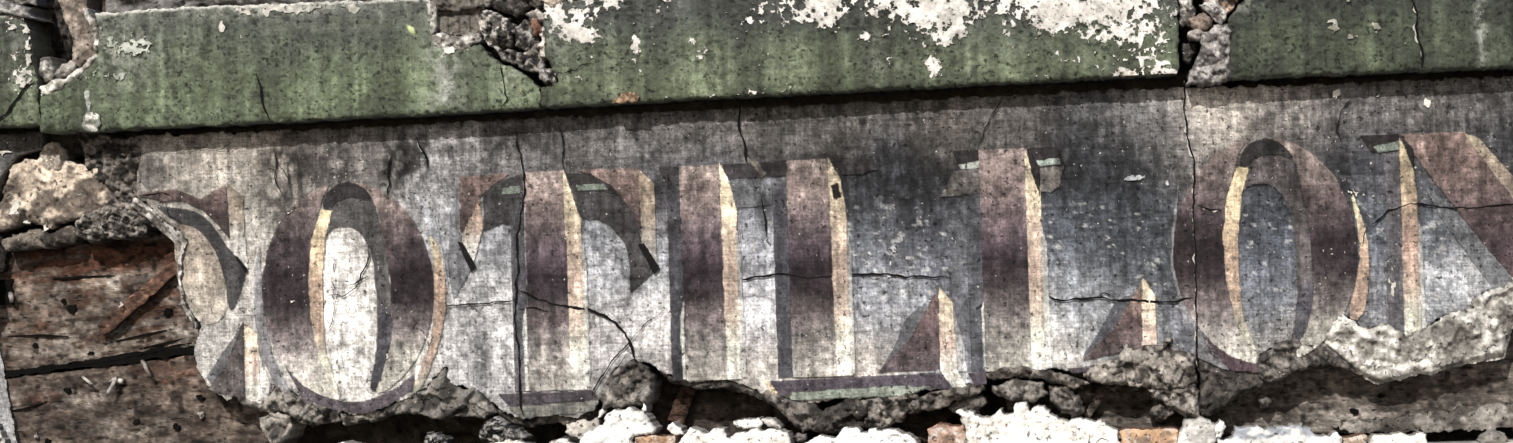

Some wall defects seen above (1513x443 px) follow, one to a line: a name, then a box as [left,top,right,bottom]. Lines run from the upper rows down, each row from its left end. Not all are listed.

spalling [426,0,623,86]
peeling [627,0,671,75]
peeling [725,0,1241,89]
peeling [1327,19,1381,39]
crack [1412,0,1424,67]
spalling [612,92,640,104]
spalling [5,0,201,329]
crack [447,65,666,416]
crack [1049,80,1221,367]
spalling [236,277,1513,443]